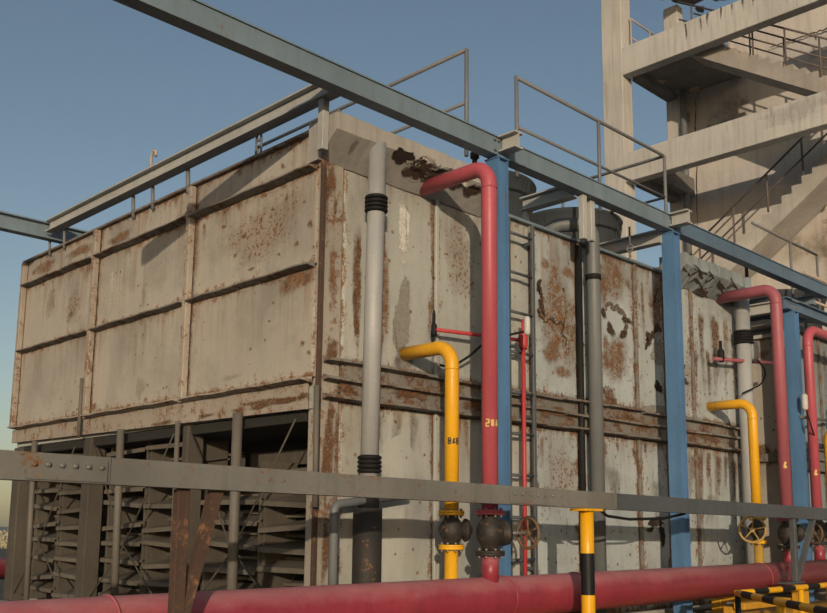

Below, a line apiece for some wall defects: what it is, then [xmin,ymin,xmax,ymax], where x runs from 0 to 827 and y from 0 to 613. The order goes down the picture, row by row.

peeling [401,156,454,183]
peeling [449,181,481,197]
corrosion [216,185,306,270]
peeling [393,276,410,353]
crack [545,316,567,346]
corrosion [539,260,584,376]
peeling [601,301,634,339]
corrosion [641,275,663,340]
peeling [645,323,664,365]
peeling [683,265,738,306]
corrosion [320,398,339,473]
corrosion [321,514,329,585]